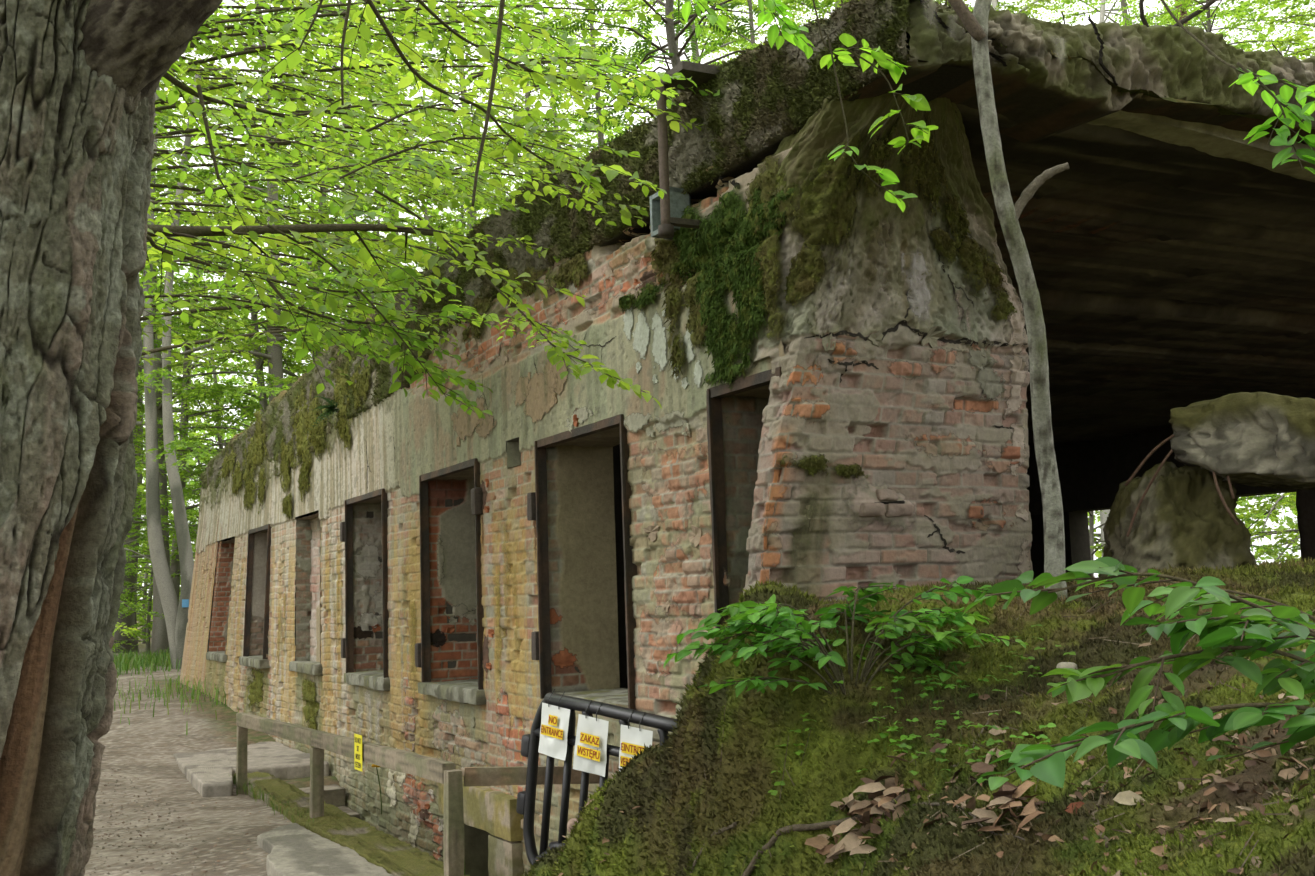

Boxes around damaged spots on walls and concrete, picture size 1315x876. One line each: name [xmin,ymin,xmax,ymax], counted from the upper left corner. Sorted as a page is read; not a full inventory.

flaking render [465,253,702,389]
crack [804,253,1027,383]
leakage [901,252,931,318]
flaking render [514,355,568,422]
spalling [783,333,858,423]
flaking render [888,263,1028,476]
flaking render [353,544,383,639]
flaking render [430,603,495,672]
spalling [619,410,730,679]
crack [924,515,965,554]
spalling [396,677,528,777]
spalling [386,769,443,860]